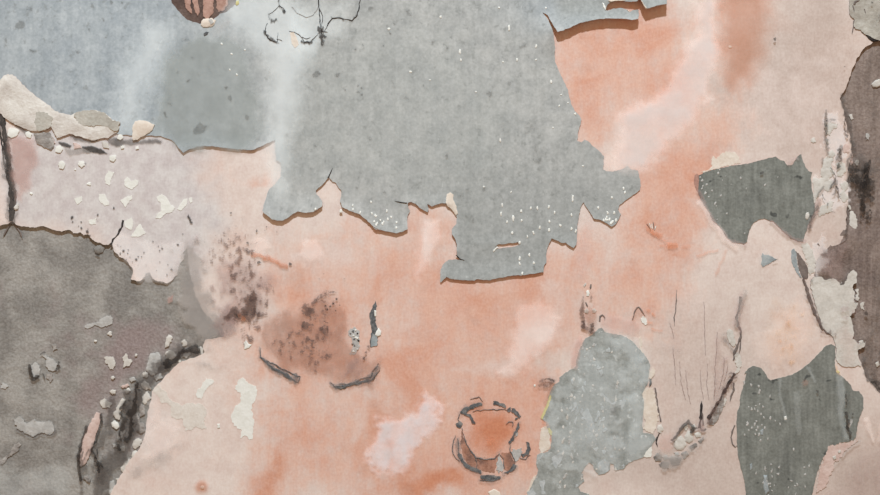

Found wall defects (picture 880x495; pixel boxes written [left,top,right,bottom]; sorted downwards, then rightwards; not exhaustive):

crack [263,0,361,45]
crack [0,114,22,237]
peeling [0,0,667,495]
flaking render [801,40,880,393]
damp [850,160,876,223]
damp [180,226,301,384]
damp [274,291,338,372]
damp [348,301,381,360]
damp [330,364,380,389]
rust [452,396,531,495]
flaking render [644,401,706,470]
flaking render [816,439,858,492]